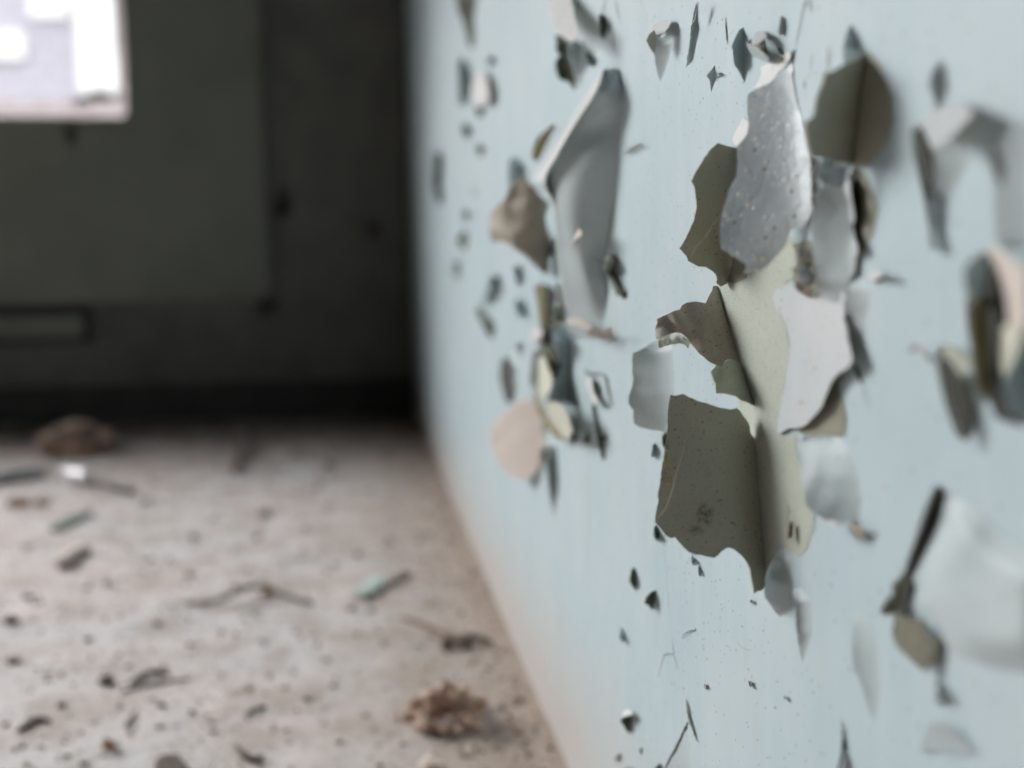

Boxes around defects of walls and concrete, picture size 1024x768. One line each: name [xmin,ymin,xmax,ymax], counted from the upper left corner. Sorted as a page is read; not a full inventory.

peeling [476,273,498,338]
peeling [489,124,613,481]
peeling [628,20,892,663]